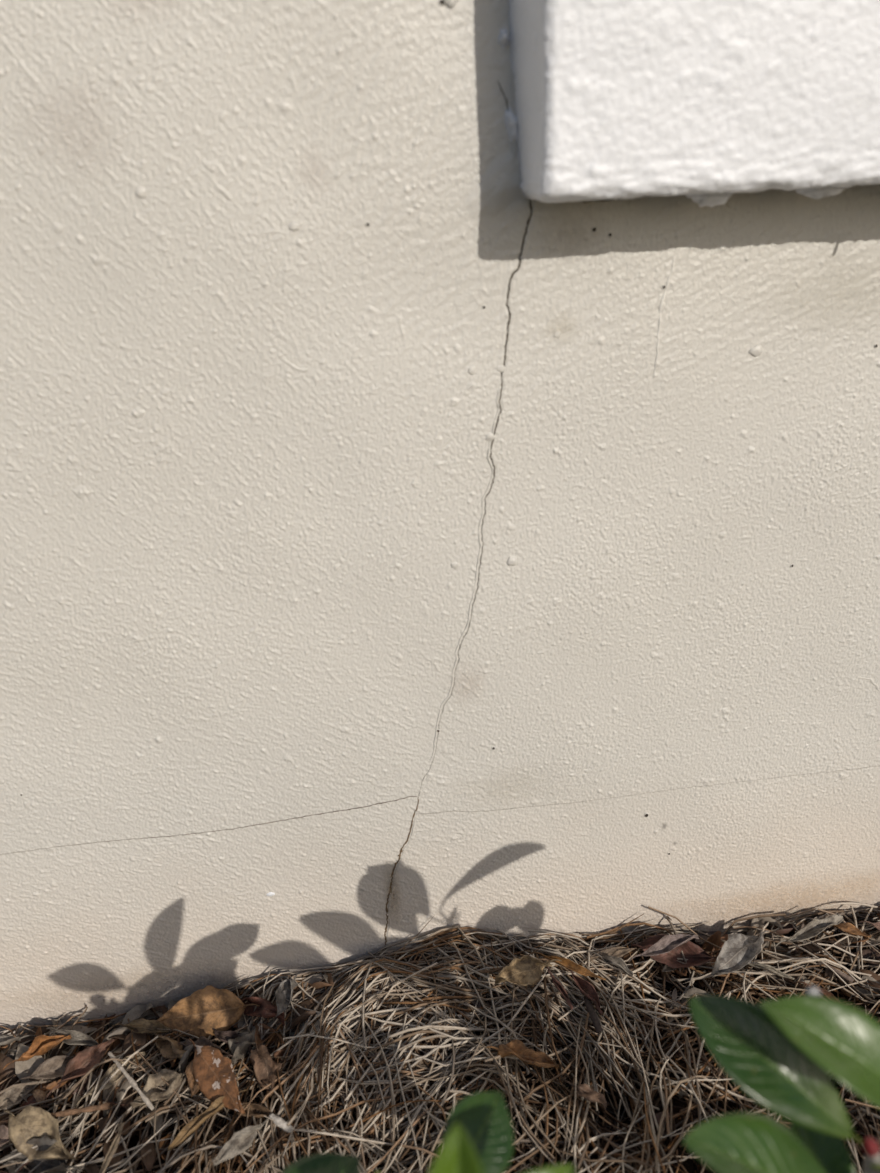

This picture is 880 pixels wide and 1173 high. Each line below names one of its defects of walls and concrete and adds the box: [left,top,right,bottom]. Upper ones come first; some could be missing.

crack [1,199,875,950]